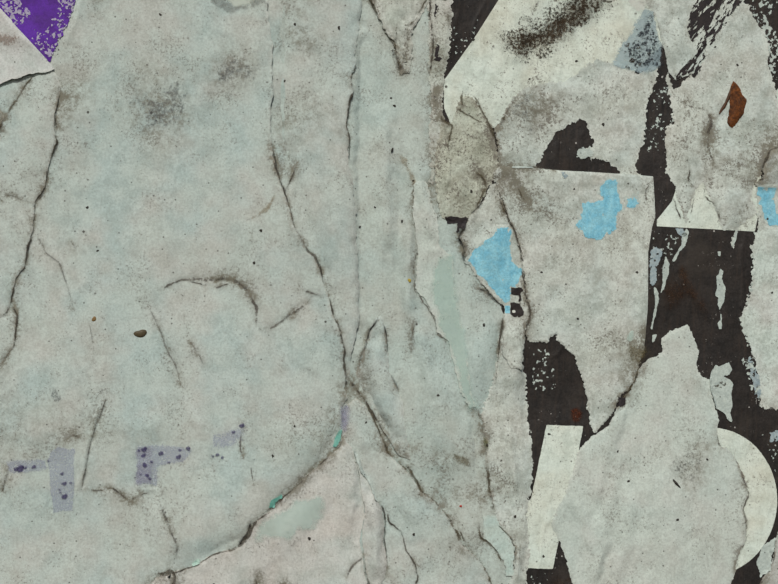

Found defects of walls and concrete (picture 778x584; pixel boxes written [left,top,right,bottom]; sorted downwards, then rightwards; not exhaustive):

mould [497,0,613,64]
crack [35,99,59,206]
crack [345,93,353,155]
crack [441,95,514,148]
crack [23,227,34,269]
crack [458,172,531,334]
crack [3,287,18,358]
crack [158,151,512,584]
peeling [710,362,733,422]
peeling [748,357,761,399]
peeling [756,538,776,577]